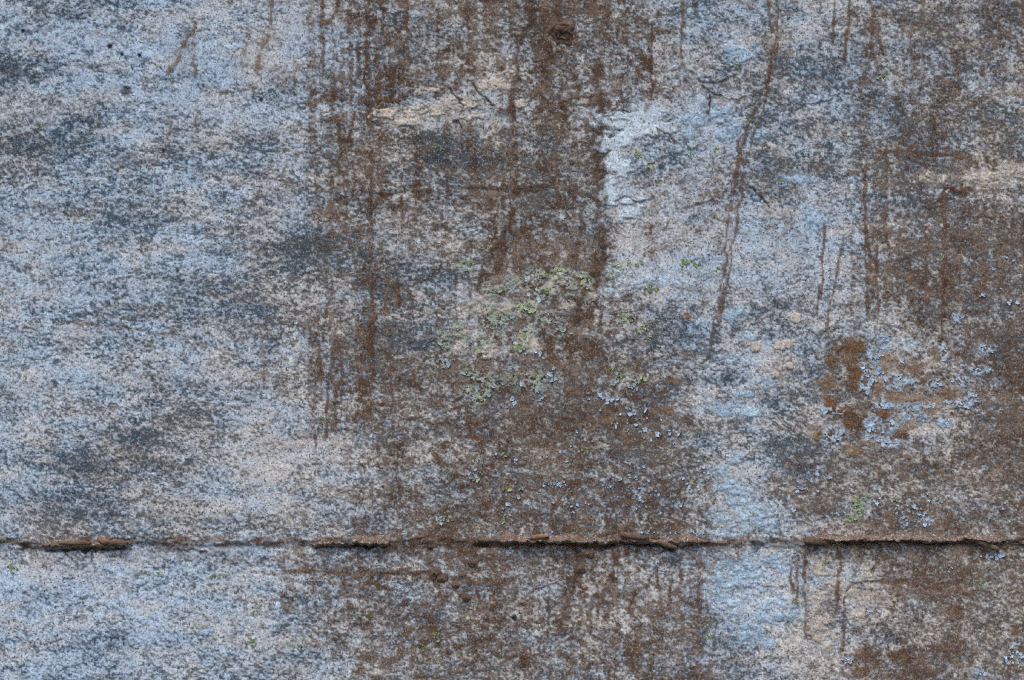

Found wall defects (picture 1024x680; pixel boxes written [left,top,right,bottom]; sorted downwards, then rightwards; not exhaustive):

leakage [255,2,273,72]
leakage [267,0,717,680]
leakage [788,0,1024,680]
rust [813,341,963,438]
crack [18,546,127,554]
crack [315,543,390,551]
crack [475,542,674,552]
crack [839,539,1024,547]